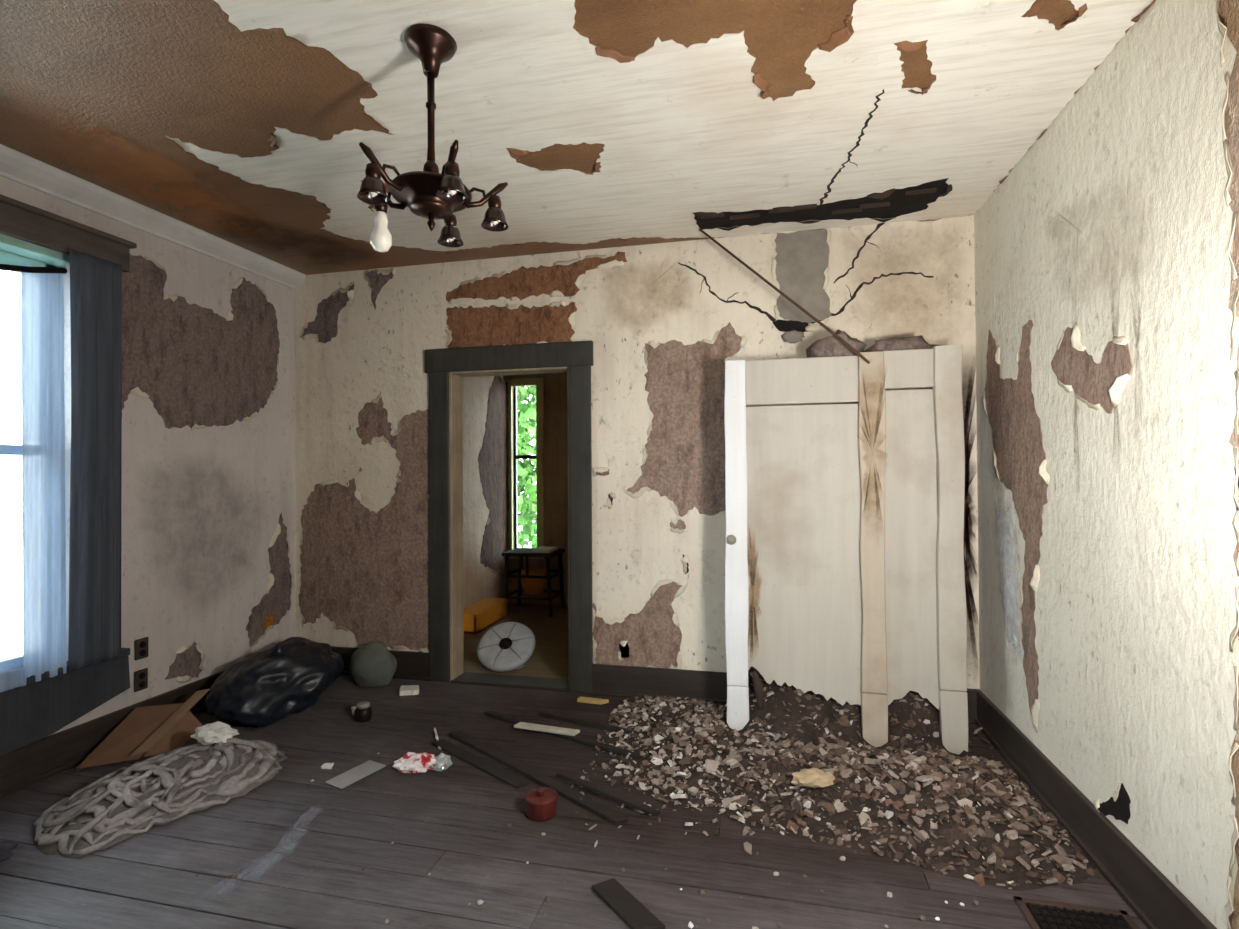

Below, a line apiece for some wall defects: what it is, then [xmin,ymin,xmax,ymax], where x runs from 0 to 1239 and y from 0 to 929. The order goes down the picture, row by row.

peeling [165,0,1156,348]
crack [820,90,884,205]
peeling [122,254,280,431]
crack [678,262,776,322]
crack [831,223,934,316]
peeling [1051,322,1133,414]
peeling [246,391,429,653]
peeling [592,467,609,477]
peeling [607,322,747,534]
peeling [983,320,1050,733]
peeling [592,554,689,669]